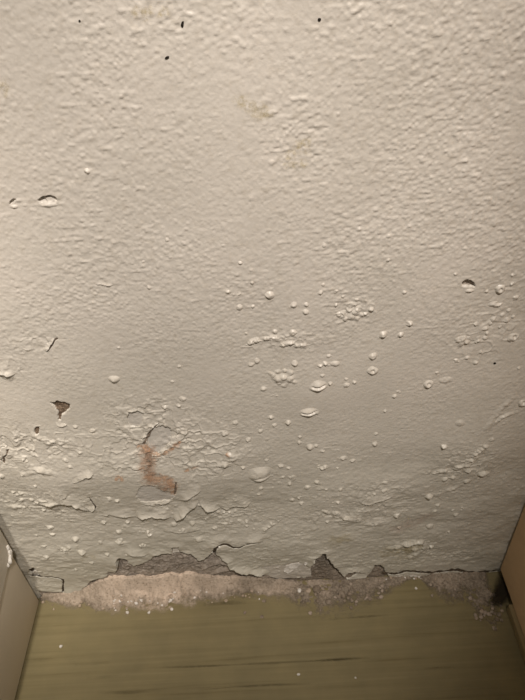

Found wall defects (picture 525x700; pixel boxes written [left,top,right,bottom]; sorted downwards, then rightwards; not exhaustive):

crack [43,338,58,352]
peeling [52,400,70,427]
peeling [127,408,187,459]
peeling [34,467,251,522]
peeling [107,546,418,581]
crack [382,567,499,575]